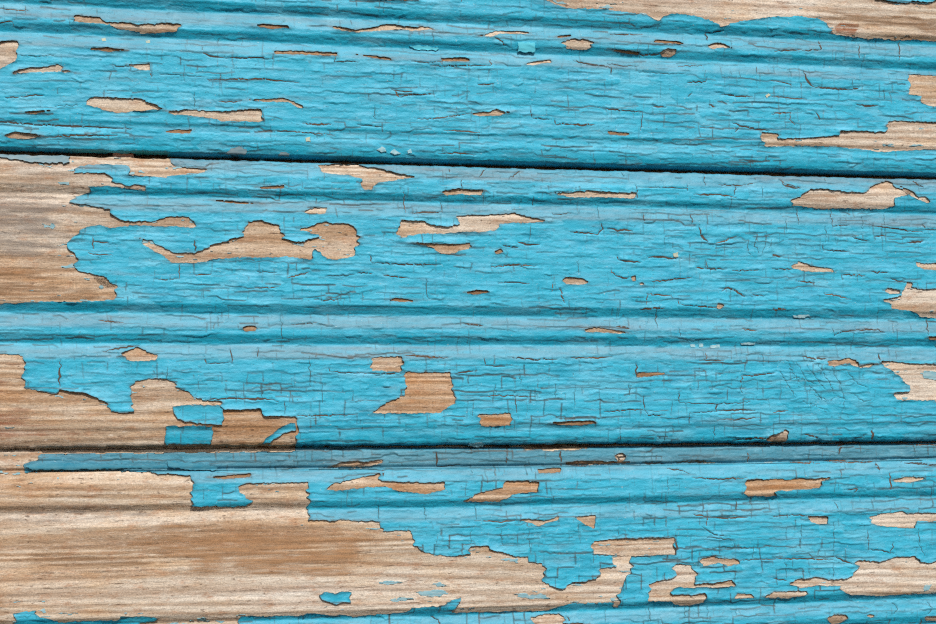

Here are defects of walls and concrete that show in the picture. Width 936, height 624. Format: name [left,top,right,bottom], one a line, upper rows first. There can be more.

peeling [547,0,936,41]
crack [0,94,132,138]
crack [576,34,885,132]
peeling [760,120,936,152]
peeling [0,153,207,304]
peeling [139,207,360,263]
crack [492,172,800,284]
crack [611,254,903,336]
crack [200,354,606,417]
crack [489,355,788,490]
peeling [0,354,754,624]
peeling [765,556,936,598]